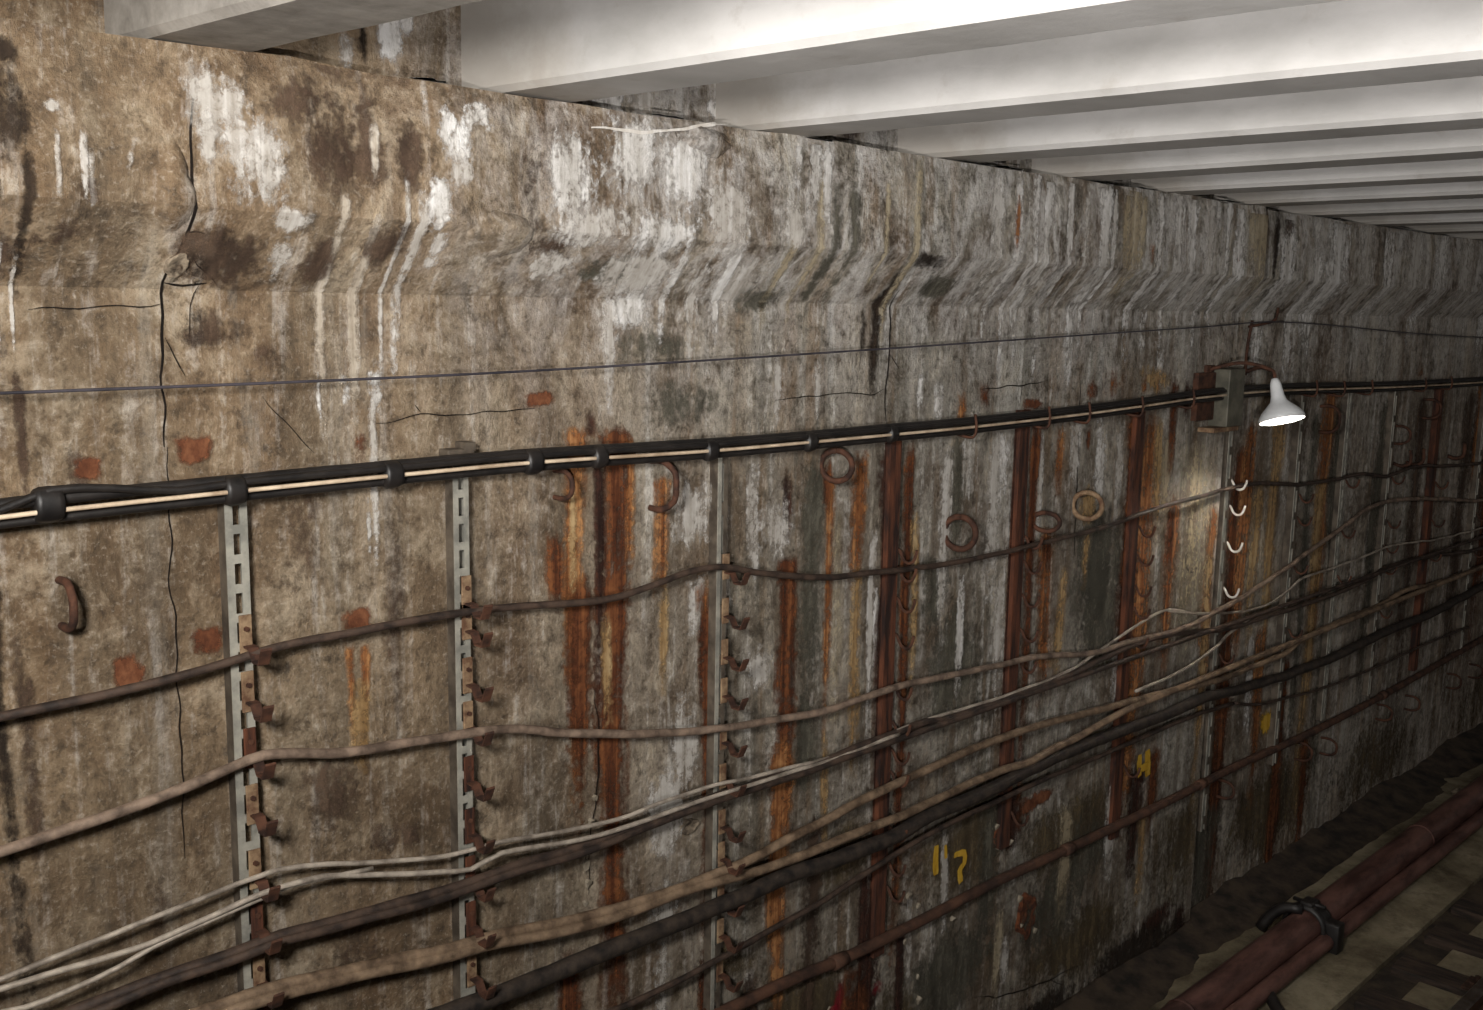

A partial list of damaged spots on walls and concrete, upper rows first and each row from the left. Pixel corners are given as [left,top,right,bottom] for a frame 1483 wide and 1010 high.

damp [0,37,81,342]
crack [29,98,206,857]
crack [264,399,312,451]
damp [171,17,490,709]
corrosion [545,415,635,907]
damp [524,92,862,407]
corrosion [765,559,797,1010]
corrosion [820,447,919,1010]
damp [866,536,879,711]
damp [860,169,955,394]
corrosion [1116,380,1190,902]
corrosion [1192,387,1337,900]